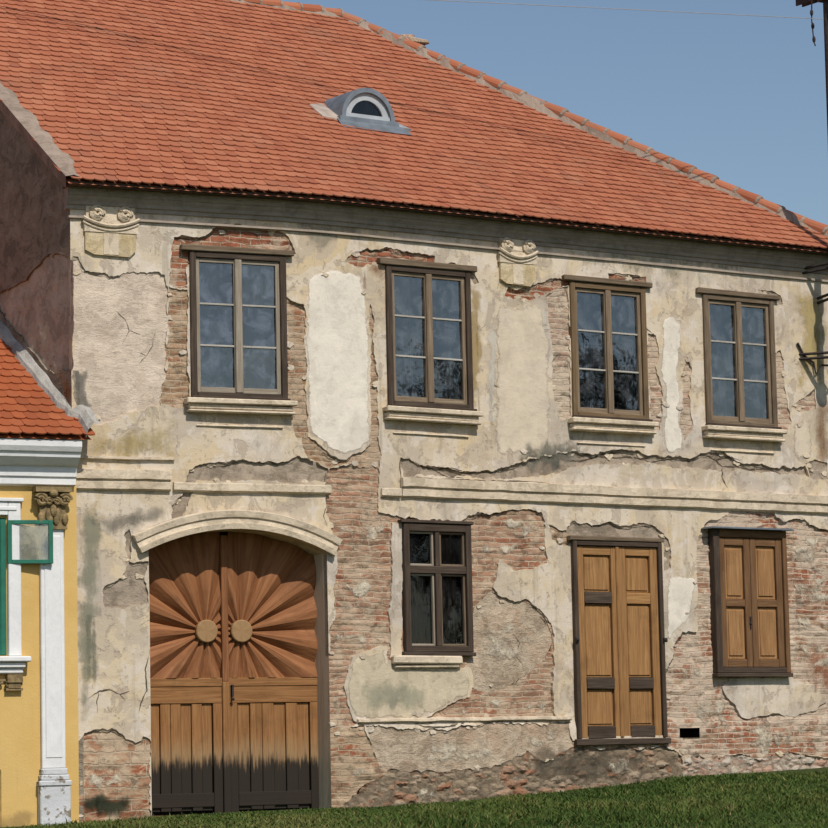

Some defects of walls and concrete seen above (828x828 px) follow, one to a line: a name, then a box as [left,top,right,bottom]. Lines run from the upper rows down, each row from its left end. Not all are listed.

flaking render [346,247,434,268]
spalling [0,224,295,426]
damp [82,516,100,592]
spalling [171,493,191,519]
flaking render [186,278,828,808]
damp [79,603,96,676]
crack [89,651,150,712]
flaking render [79,728,151,822]